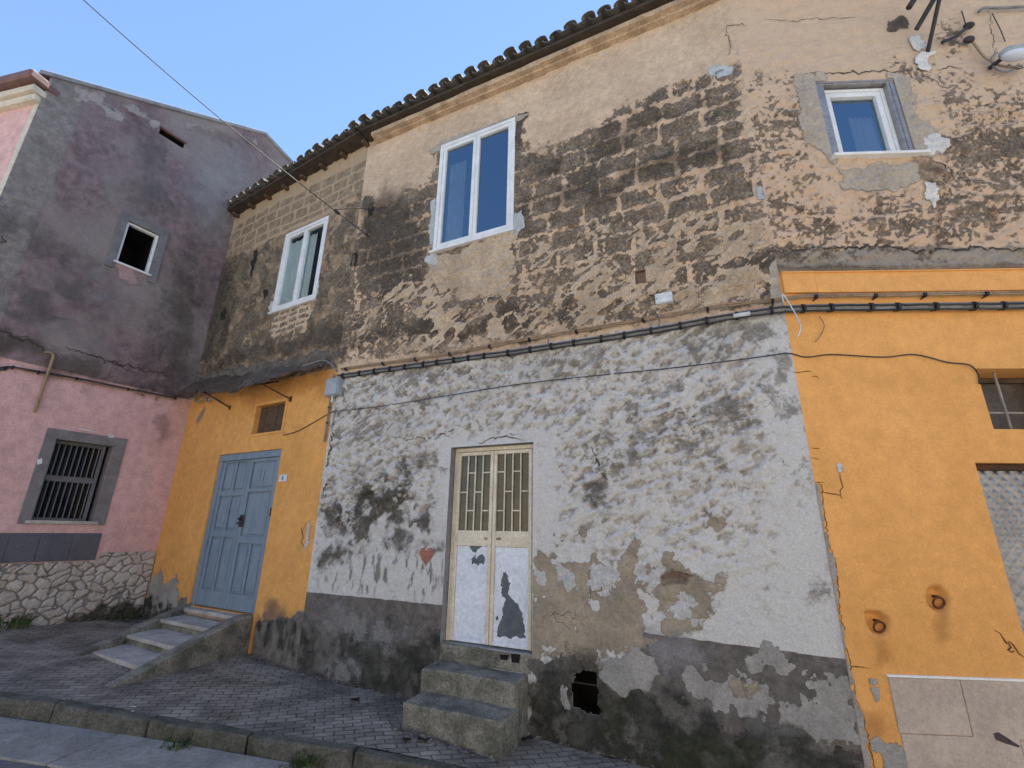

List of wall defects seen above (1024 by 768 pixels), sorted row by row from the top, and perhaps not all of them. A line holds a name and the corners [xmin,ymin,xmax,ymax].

crack [725,17,854,54]
spalling [893,56,949,83]
spalling [197,64,1024,421]
crack [0,330,171,377]
peeling [584,385,759,473]
water stain [317,460,443,593]
peeling [147,569,179,612]
water stain [319,604,407,644]
peeling [500,478,908,768]
crack [995,630,1024,657]
water stain [326,658,361,682]